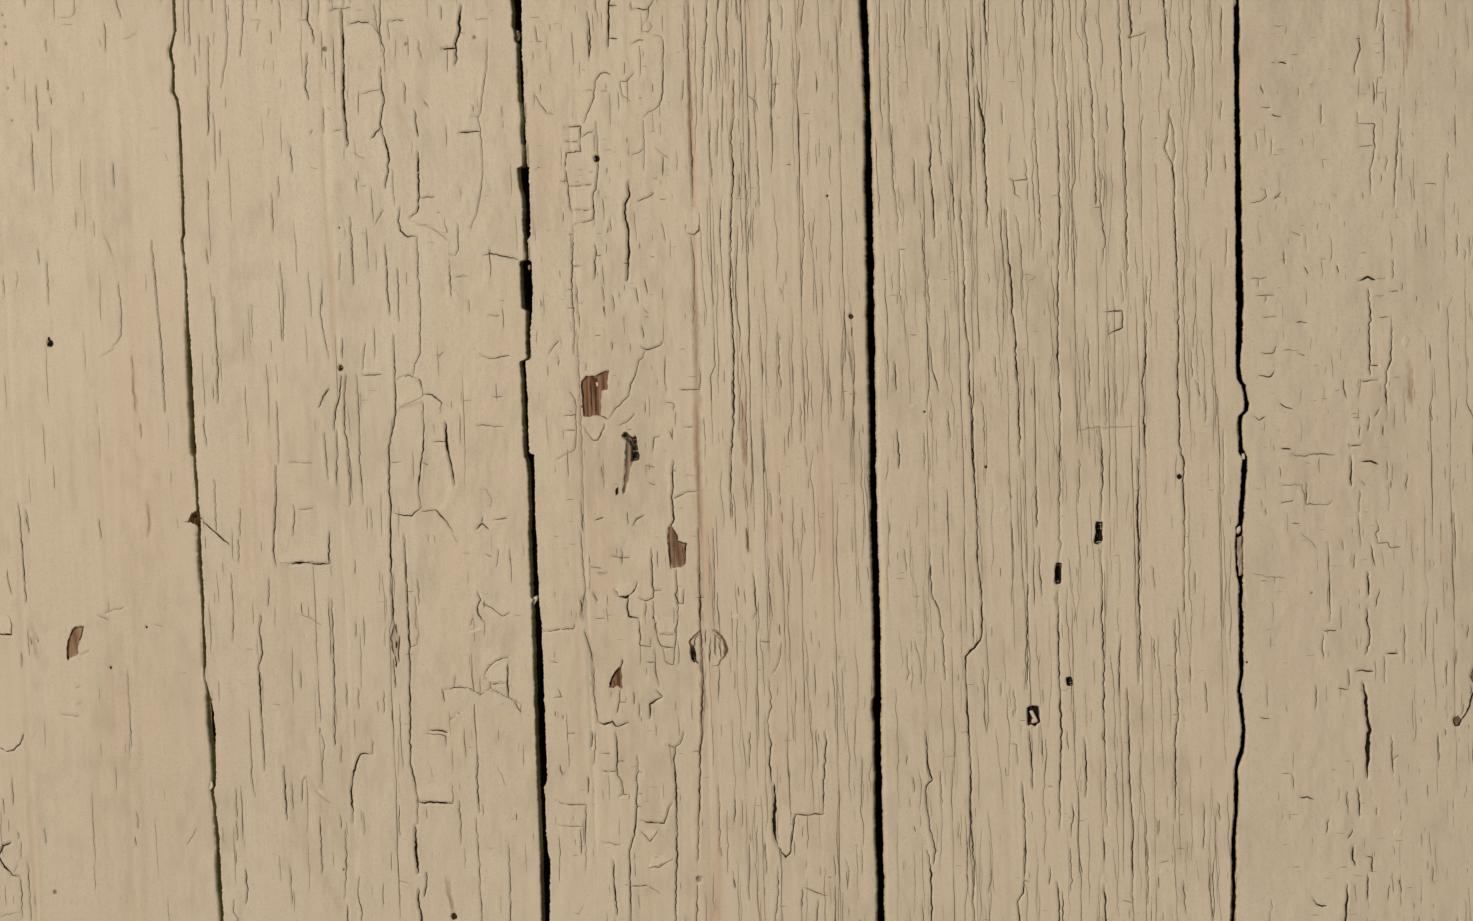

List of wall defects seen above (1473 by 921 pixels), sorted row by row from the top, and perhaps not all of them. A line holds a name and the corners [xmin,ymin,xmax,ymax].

crack [25,0,137,48]
crack [13,67,172,483]
peeling [581,370,609,440]
peeling [615,432,640,495]
crack [0,430,55,656]
peeling [667,527,687,570]
peeling [66,626,84,660]
peeling [609,667,623,689]
spalling [1453,669,1473,726]